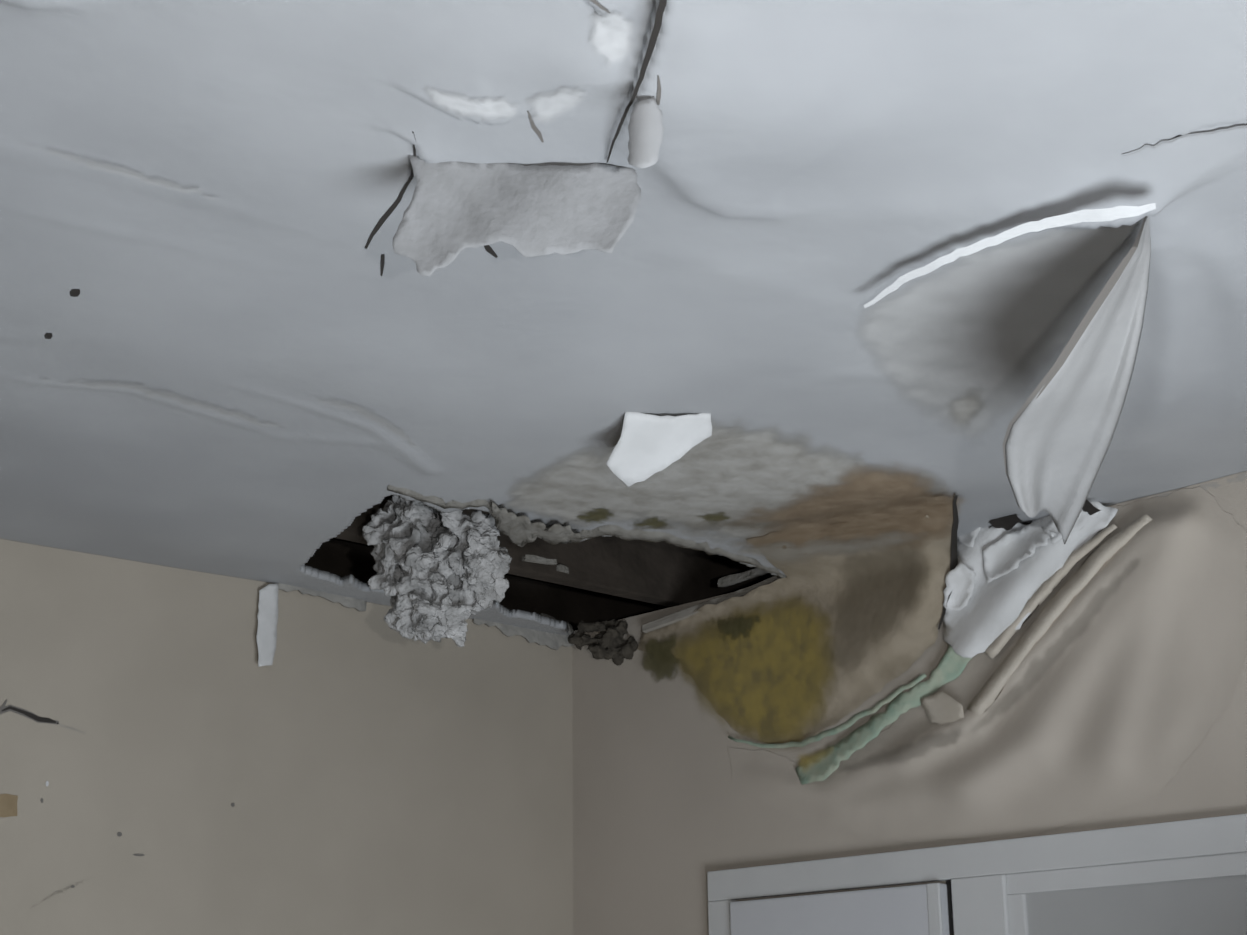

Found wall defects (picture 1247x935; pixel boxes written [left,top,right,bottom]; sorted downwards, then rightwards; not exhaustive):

peeling [590,14,632,62]
peeling [428,88,583,143]
peeling [365,132,641,276]
flaking render [862,225,1132,434]
flaking render [387,412,867,578]
crack [0,699,86,734]
peeling [256,583,367,667]
water stain [643,600,830,744]